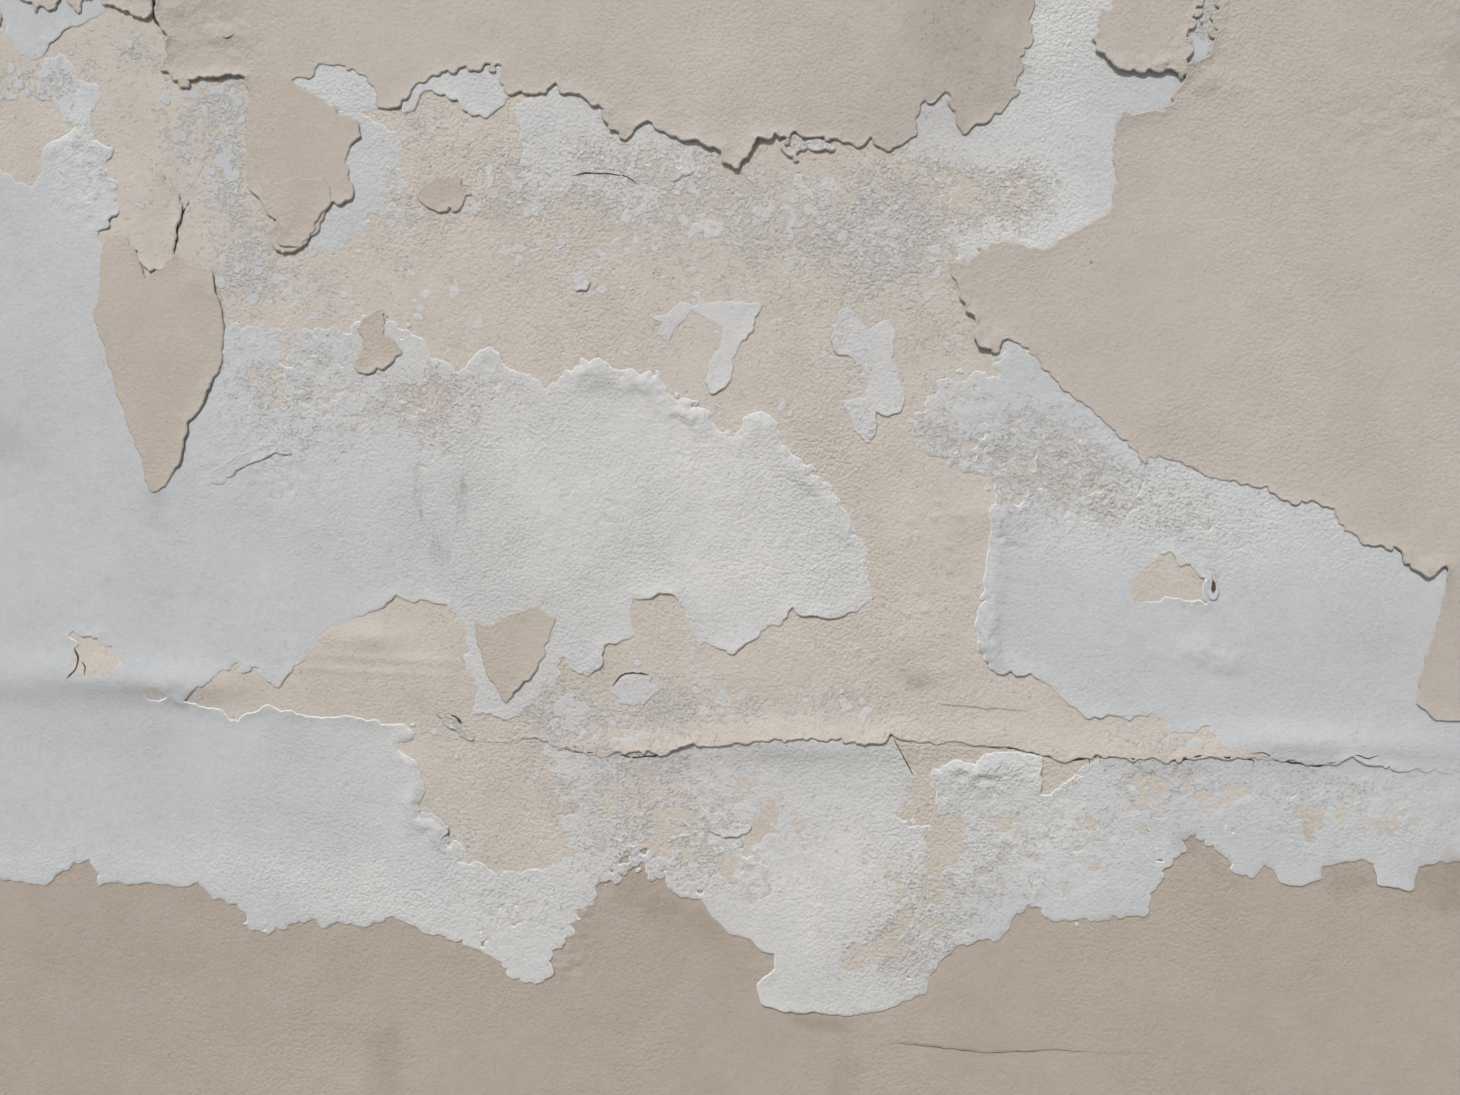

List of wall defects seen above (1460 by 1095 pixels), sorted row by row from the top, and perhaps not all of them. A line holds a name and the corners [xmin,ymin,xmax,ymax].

crack [152,0,163,32]
peeling [1187,0,1219,49]
peeling [1129,552,1206,603]
peeling [70,632,122,678]
crack [565,748,670,758]
peeling [525,752,580,868]
peeling [625,768,684,814]
peeling [640,799,703,860]
peeling [717,855,744,886]
peeling [930,751,1194,957]
peeling [1187,757,1460,892]
peeling [840,909,947,972]